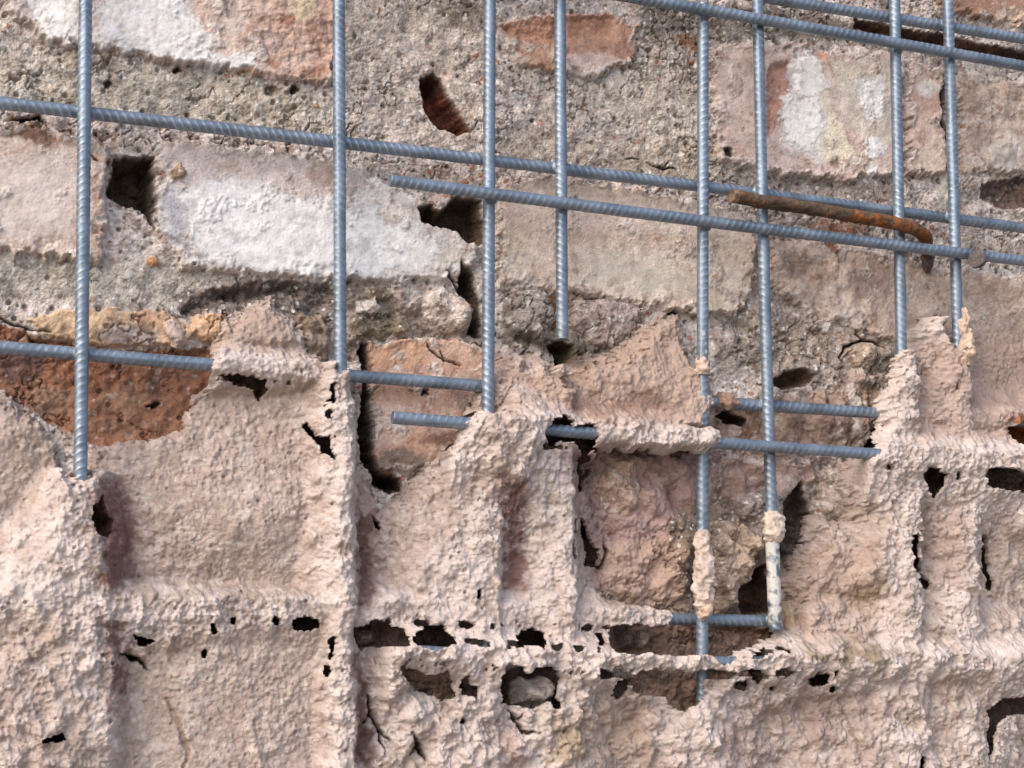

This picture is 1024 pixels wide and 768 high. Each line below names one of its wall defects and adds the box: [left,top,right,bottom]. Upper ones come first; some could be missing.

peeling [25,0,79,45]
peeling [92,0,333,83]
spalling [499,13,614,44]
spalling [853,17,1024,61]
peeling [766,50,831,152]
peeling [0,154,77,246]
spalling [979,139,1024,210]
peeling [177,175,447,321]
spalling [0,324,75,347]
crack [838,339,872,359]
spalling [0,354,75,434]
spalling [88,345,212,447]